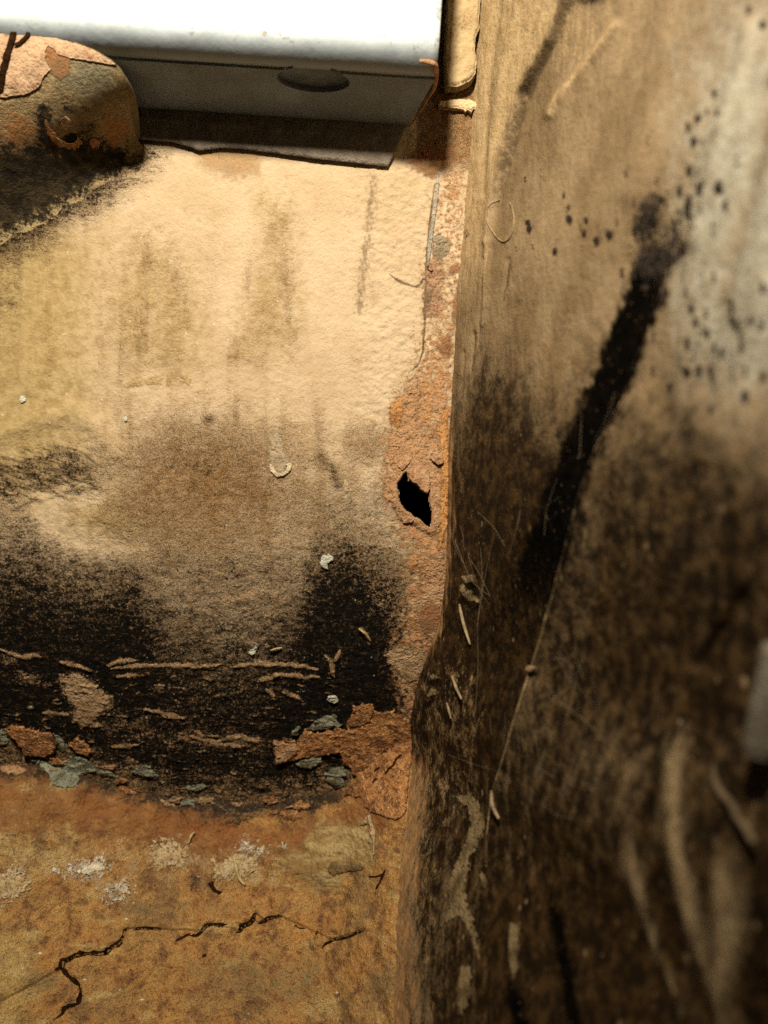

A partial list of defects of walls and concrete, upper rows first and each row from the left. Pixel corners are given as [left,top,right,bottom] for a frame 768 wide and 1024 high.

leakage [490,88,740,628]
leakage [665,281,766,391]
leakage [269,432,292,477]
rust [0,142,469,858]
spalling [397,453,444,527]
peeling [290,695,342,736]
peeling [32,733,115,789]
peeling [295,756,347,788]
leakage [0,851,138,909]
leakage [147,833,196,876]
leakage [210,838,287,887]
crack [53,912,364,1021]